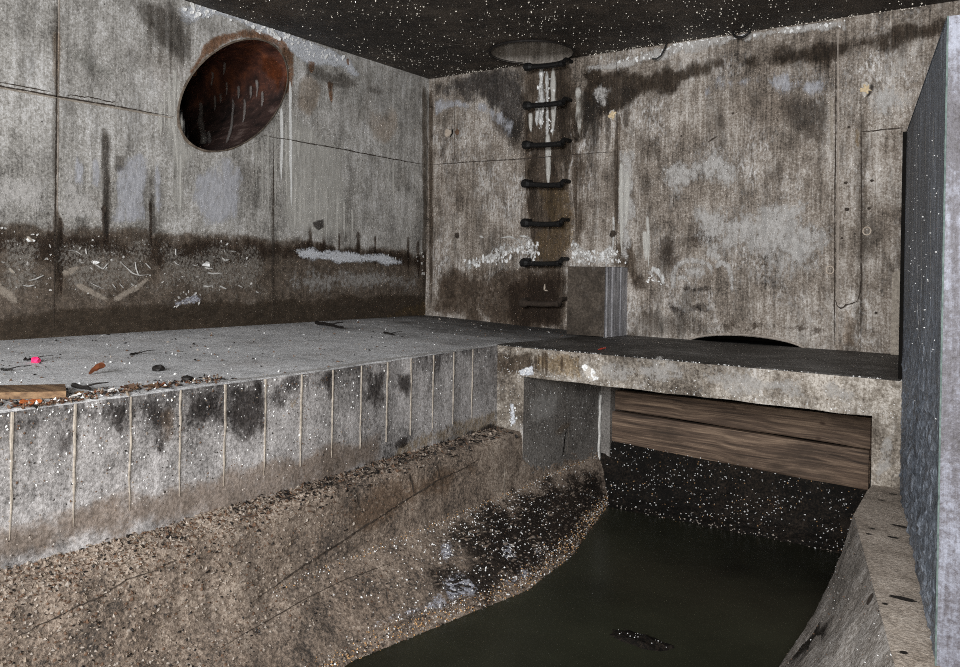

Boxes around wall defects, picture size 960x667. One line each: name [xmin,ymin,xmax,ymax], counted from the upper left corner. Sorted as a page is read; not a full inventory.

water stain [436,68,561,183]
water stain [576,20,846,141]
water stain [862,21,945,48]
water stain [0,63,426,340]